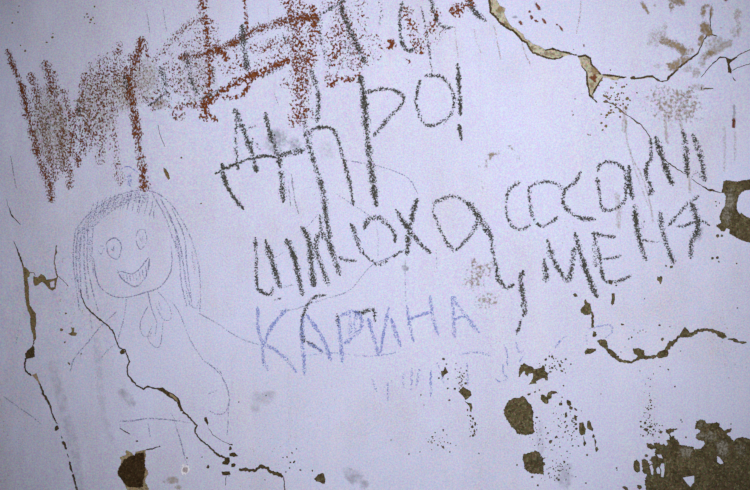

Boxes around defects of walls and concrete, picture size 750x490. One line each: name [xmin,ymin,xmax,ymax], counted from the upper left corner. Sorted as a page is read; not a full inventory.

crack [488,0,750,193]
peeling [715,179,750,243]
crack [580,299,747,363]
crack [14,242,285,490]
spalling [518,363,548,384]
spalling [504,393,538,435]
spalling [118,446,160,490]
spalling [522,450,545,475]
spalling [633,419,750,490]